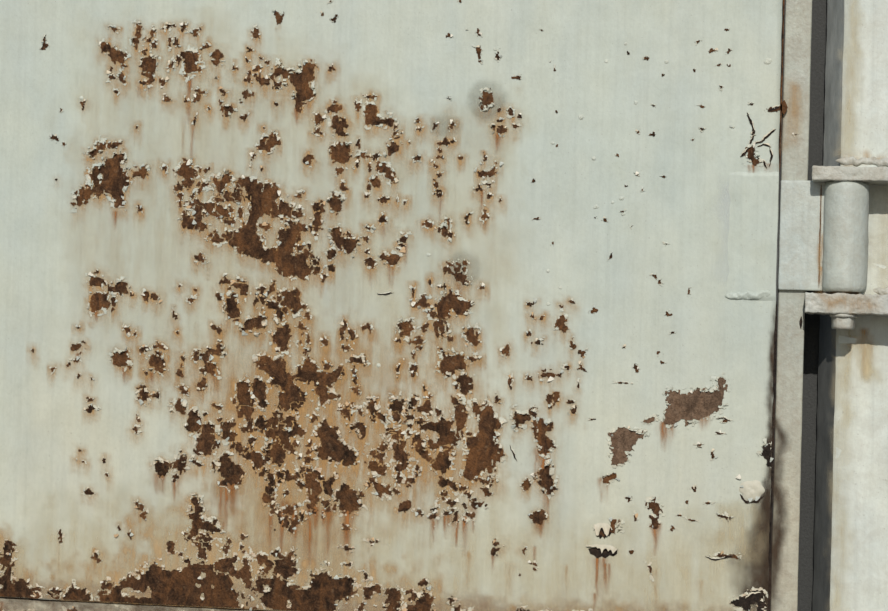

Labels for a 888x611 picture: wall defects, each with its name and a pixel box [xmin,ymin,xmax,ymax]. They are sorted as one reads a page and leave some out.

peeling [742,141,764,167]
corrosion [0,24,496,611]
peeling [0,19,577,611]
peeling [525,298,588,389]
peeling [600,372,733,486]
corrosion [731,301,777,611]
corrosion [589,528,617,582]
peeling [728,587,768,611]